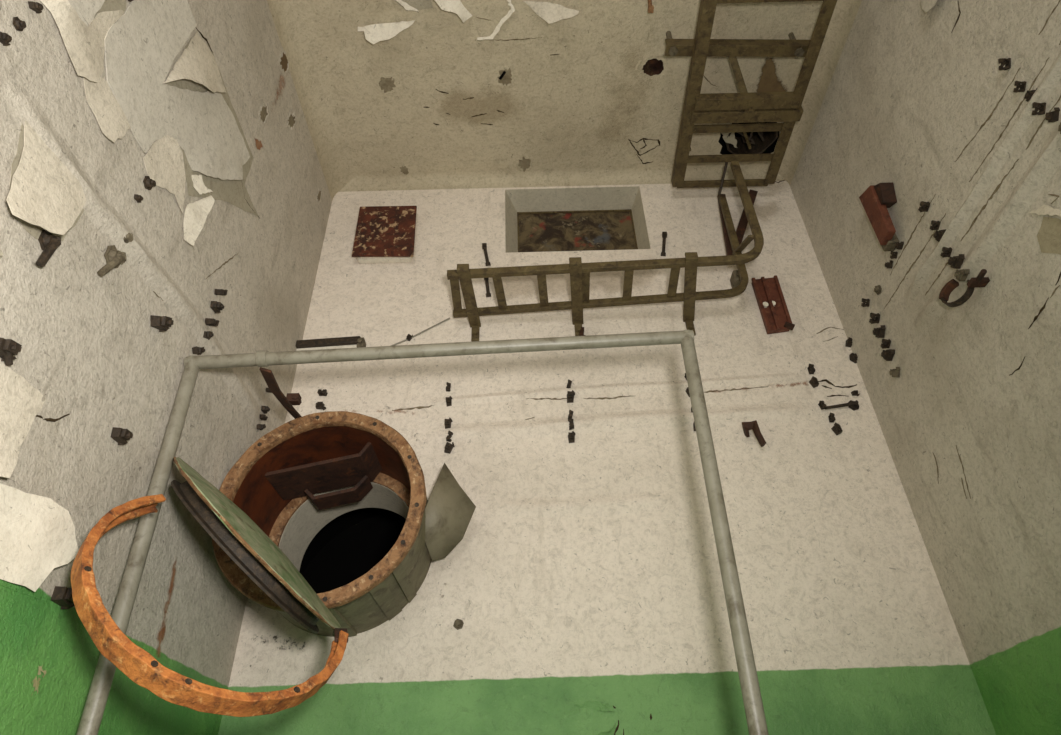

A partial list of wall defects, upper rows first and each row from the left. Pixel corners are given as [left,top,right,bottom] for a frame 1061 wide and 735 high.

peeling [358,0,579,45]
peeling [6,120,86,241]
peeling [40,0,260,246]
crack [884,194,946,309]
crack [955,0,1061,241]
crack [1028,272,1061,329]
peeling [1029,205,1061,255]
peeling [0,361,85,600]